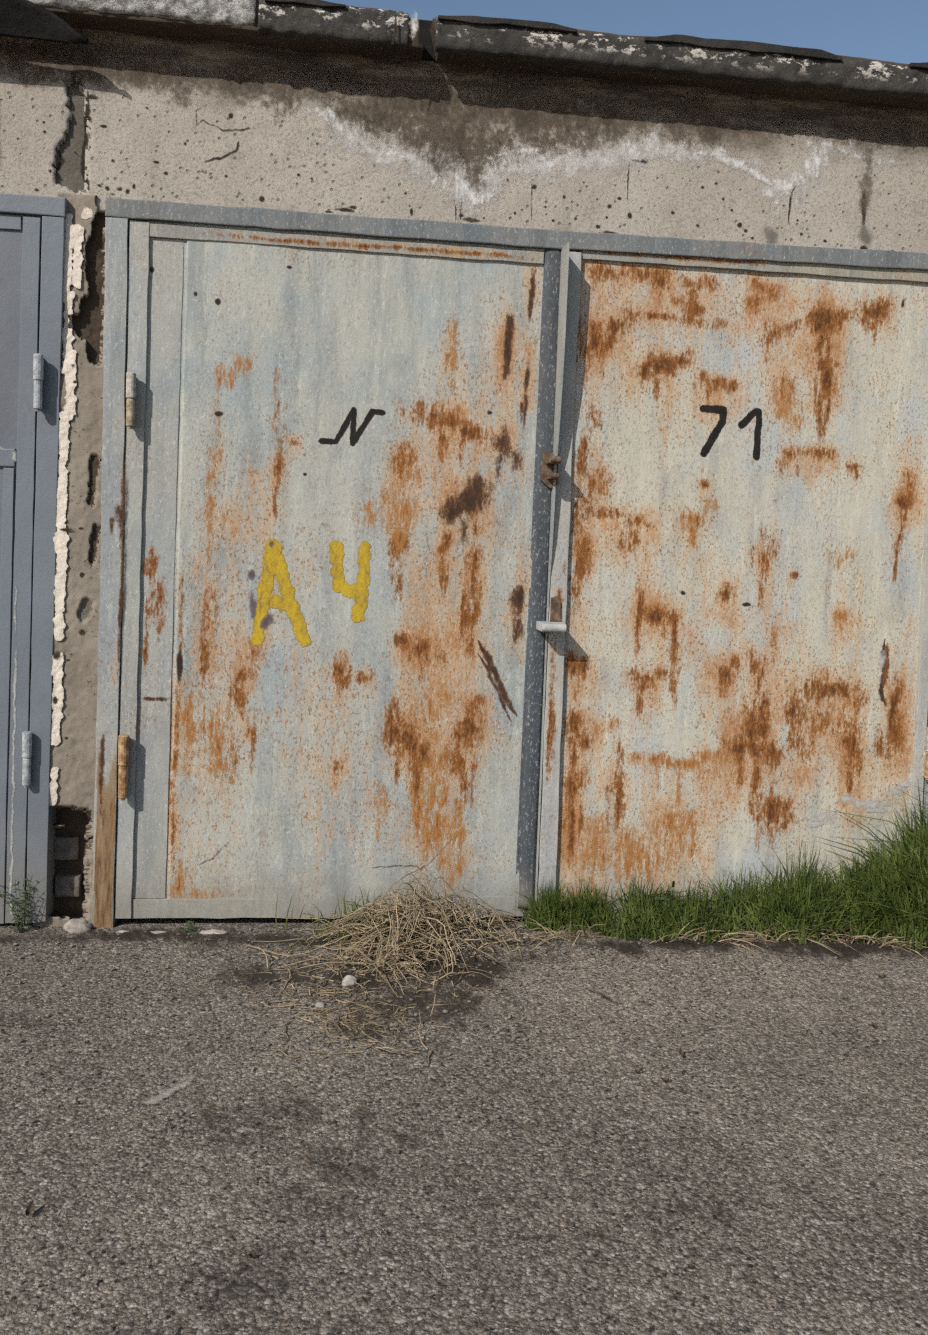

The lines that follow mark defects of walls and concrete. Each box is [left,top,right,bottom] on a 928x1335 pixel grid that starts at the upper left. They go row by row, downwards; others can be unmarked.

leakage [0,38,928,243]
flaking render [49,78,135,746]
rust [109,470,126,674]
rust [141,416,262,899]
rust [214,233,536,424]
rust [357,440,421,601]
rust [373,400,524,886]
rust [557,405,651,613]
rust [628,579,681,717]
rust [576,252,893,481]
spalling [49,767,93,918]
rust [545,628,905,901]